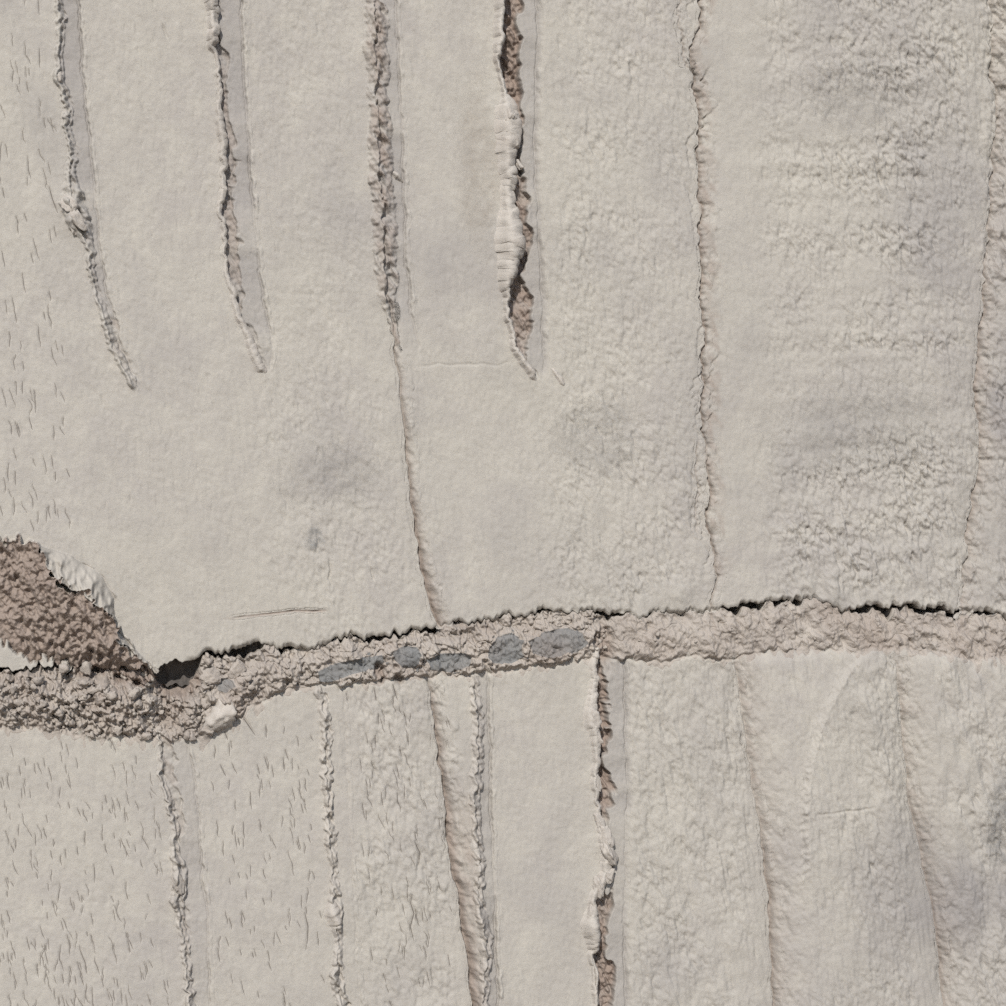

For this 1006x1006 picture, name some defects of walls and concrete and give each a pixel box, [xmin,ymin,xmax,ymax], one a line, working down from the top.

crack [0,0,142,532]
crack [203,0,278,373]
crack [338,0,479,642]
crack [490,0,565,386]
crack [673,0,796,613]
crack [850,0,1006,621]
crack [0,661,99,673]
spalling [0,534,159,687]
crack [149,608,328,687]
crack [0,669,504,1006]
crack [594,611,620,620]